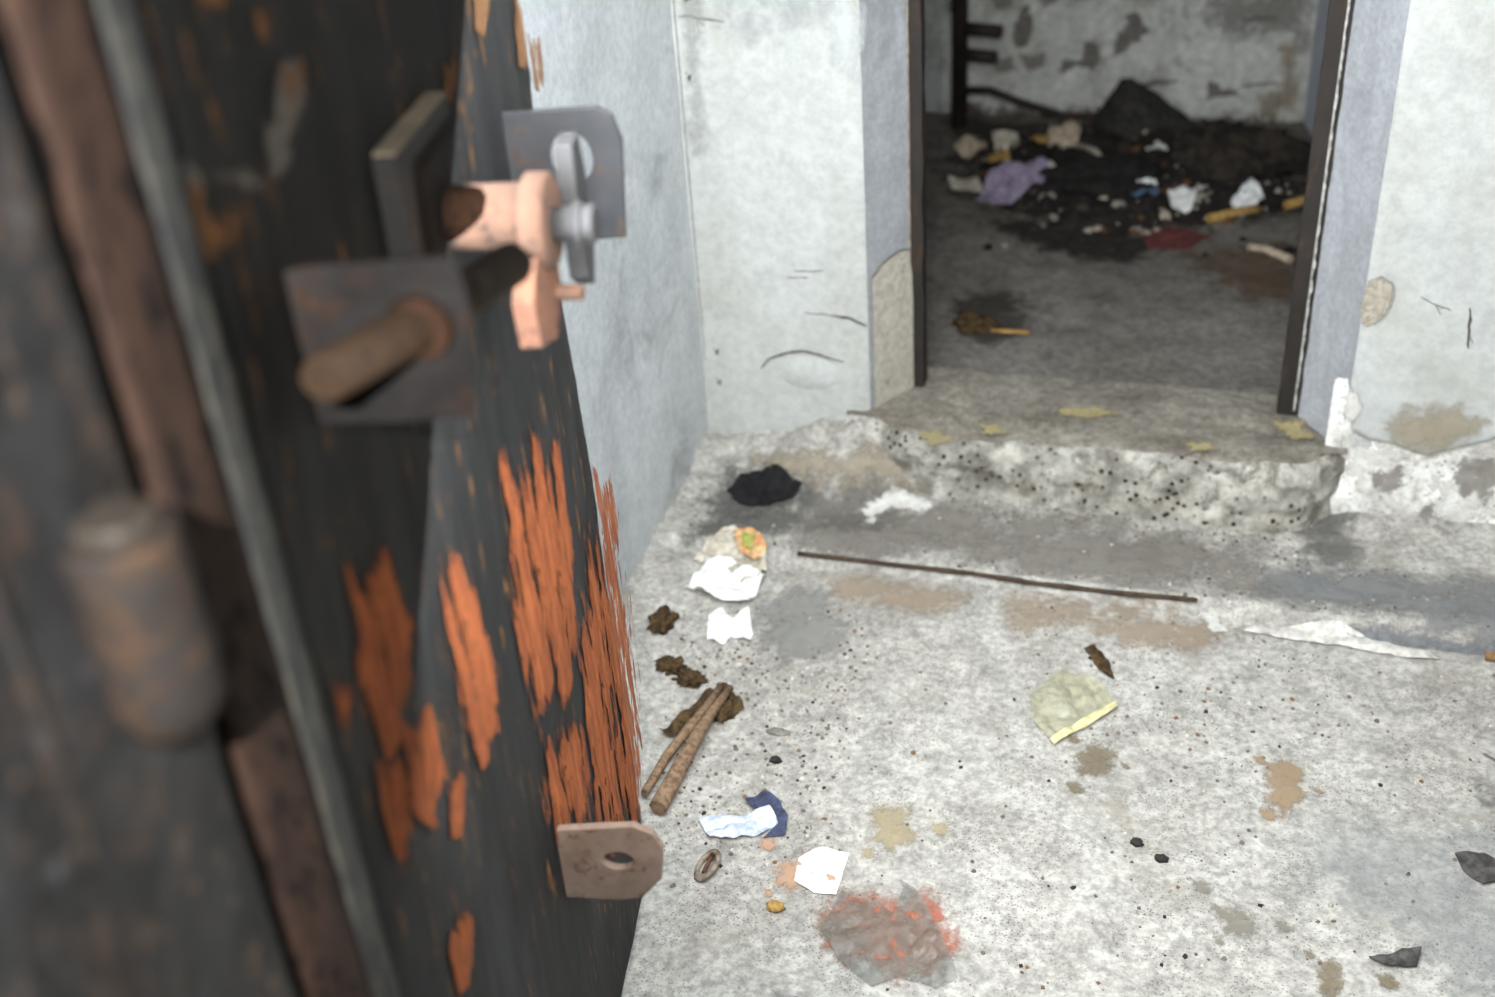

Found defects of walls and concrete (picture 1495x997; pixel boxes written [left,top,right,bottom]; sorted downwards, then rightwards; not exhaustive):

leakage [1207,0,1309,53]
peeling [1058,405,1117,419]
peeling [1186,441,1219,451]
flaking render [1272,378,1495,525]
leakage [1387,404,1489,450]
leakage [793,473,1495,655]
leakage [754,586,842,664]